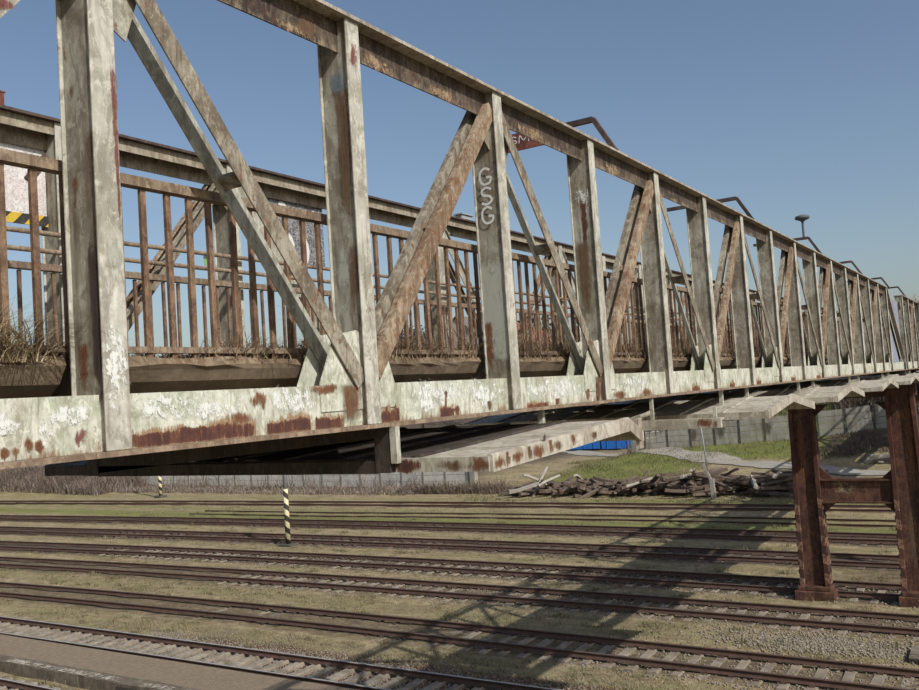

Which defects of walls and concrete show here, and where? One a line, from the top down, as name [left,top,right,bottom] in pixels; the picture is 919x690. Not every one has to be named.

rust [276,14,318,38]
rust [78,343,89,390]
peeling [104,323,248,419]
peeling [0,408,21,436]
peeling [35,405,91,447]
rust [132,384,360,448]
rust [440,391,460,417]
rust [1,438,44,460]
rust [395,459,421,474]
rust [442,434,561,471]